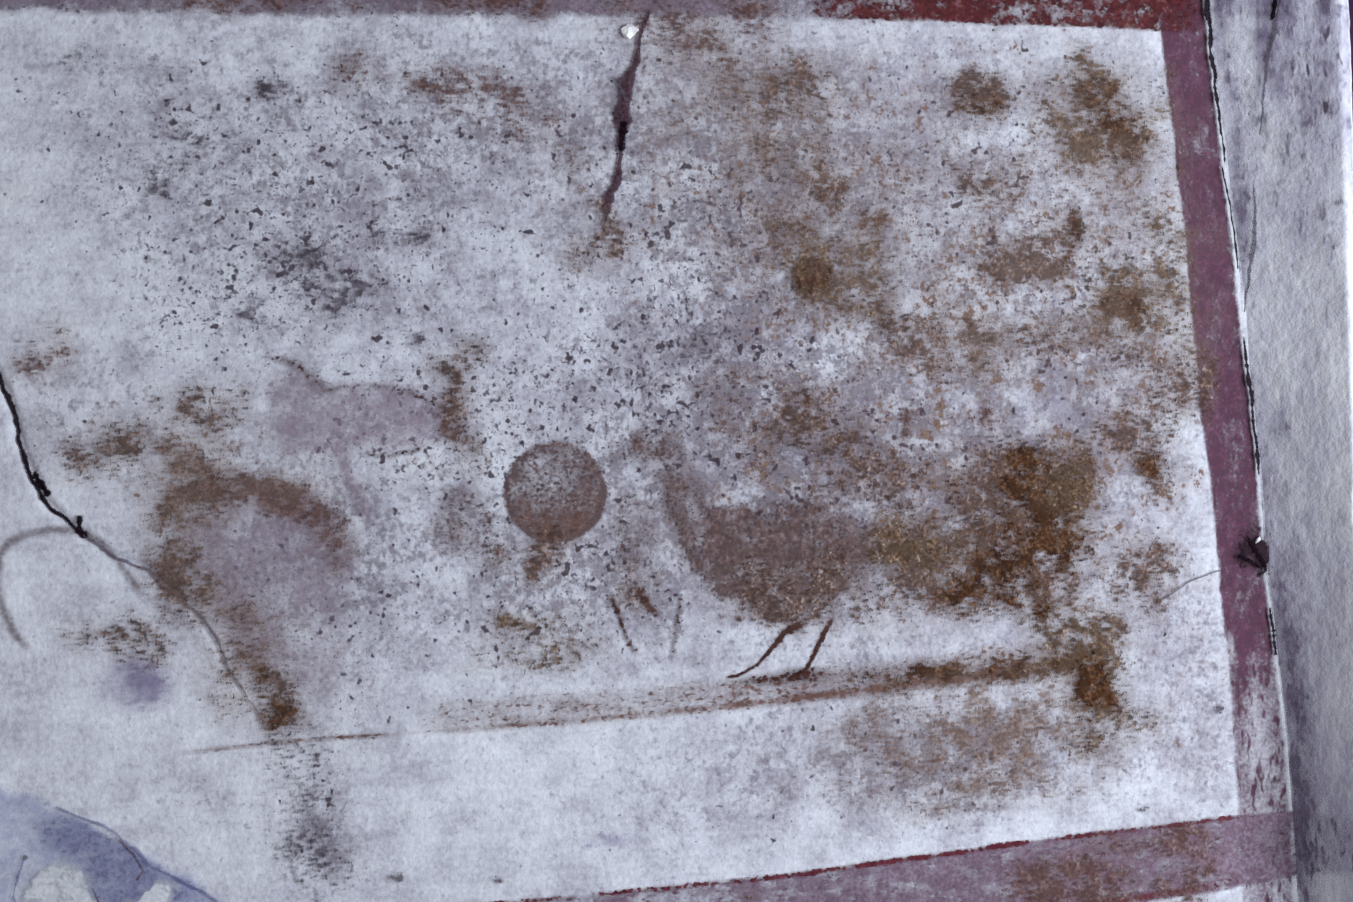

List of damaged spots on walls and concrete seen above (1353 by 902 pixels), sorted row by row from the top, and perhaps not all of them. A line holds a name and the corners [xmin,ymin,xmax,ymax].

leakage [650,31,1220,396]
crack [0,373,264,726]
leakage [821,662,1128,820]